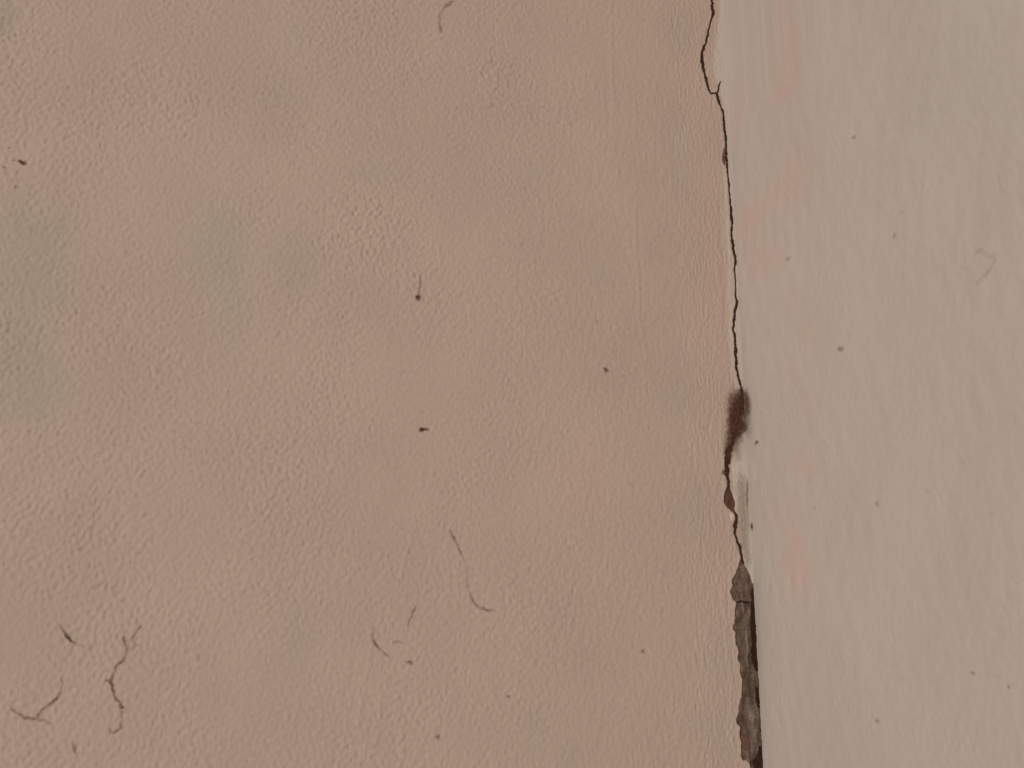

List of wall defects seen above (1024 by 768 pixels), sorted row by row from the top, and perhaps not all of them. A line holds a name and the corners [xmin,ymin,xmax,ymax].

crack [700,0,743,404]
crack [722,435,744,564]
flaking render [730,560,763,768]